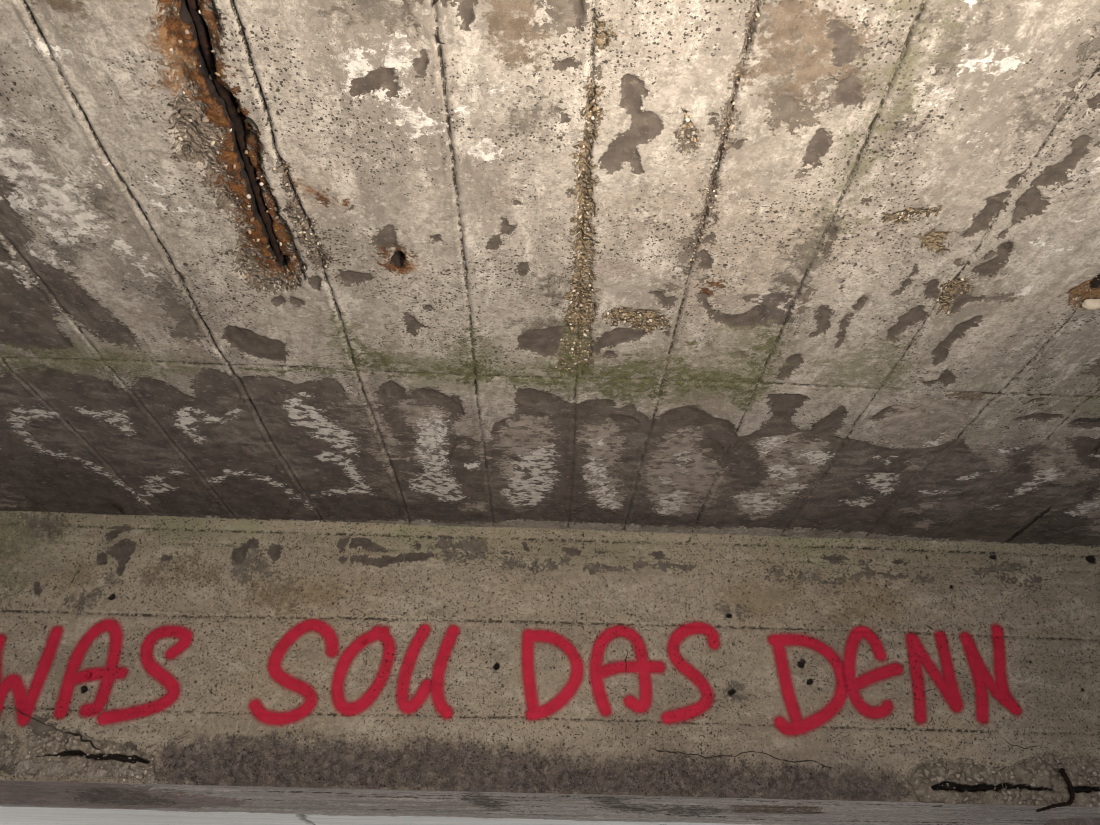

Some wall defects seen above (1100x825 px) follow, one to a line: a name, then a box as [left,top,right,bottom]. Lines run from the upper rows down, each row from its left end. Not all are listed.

leakage [20,25,74,67]
crack [223,108,260,134]
leakage [0,116,1100,613]
crack [16,709,122,751]